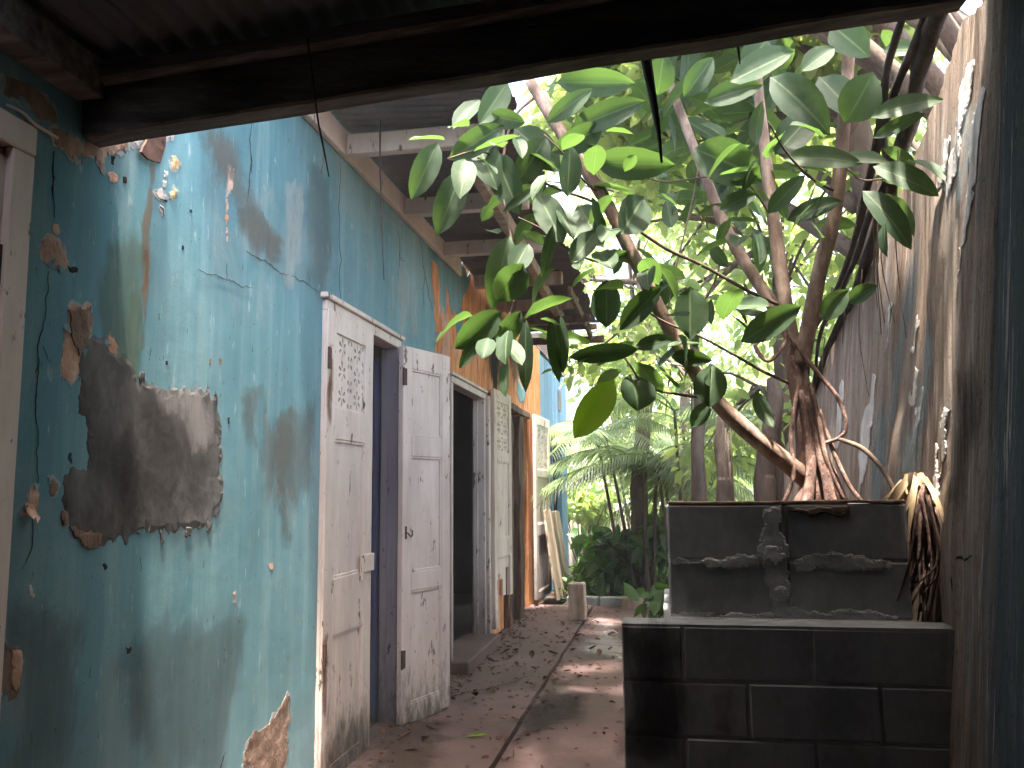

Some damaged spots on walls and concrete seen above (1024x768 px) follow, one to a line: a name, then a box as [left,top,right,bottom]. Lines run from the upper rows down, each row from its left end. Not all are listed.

crack [49,151,57,218]
peeling [0,73,145,183]
peeling [151,156,181,216]
crack [246,161,342,299]
peeling [937,60,986,279]
crack [35,272,51,481]
peeling [58,299,95,387]
peeling [858,374,876,495]
peeling [908,315,925,458]
peeling [932,407,951,503]
peeling [1,639,26,702]
peeling [242,691,291,768]